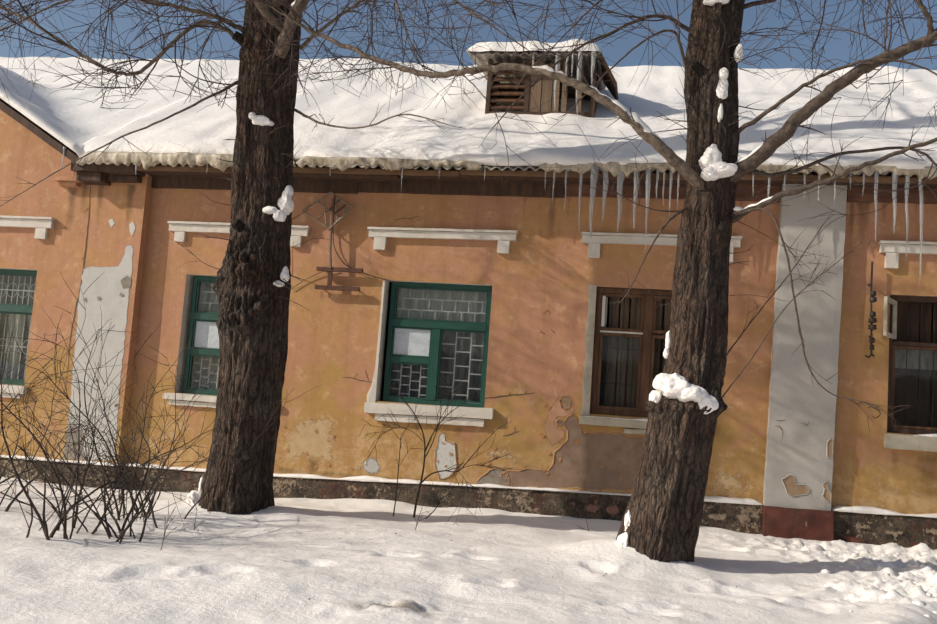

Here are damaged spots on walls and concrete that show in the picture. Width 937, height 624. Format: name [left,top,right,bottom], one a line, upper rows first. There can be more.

peeling [64,222,135,461]
peeling [357,458,380,474]
peeling [432,431,458,480]
flaking render [780,473,810,497]
flaking render [821,481,832,503]